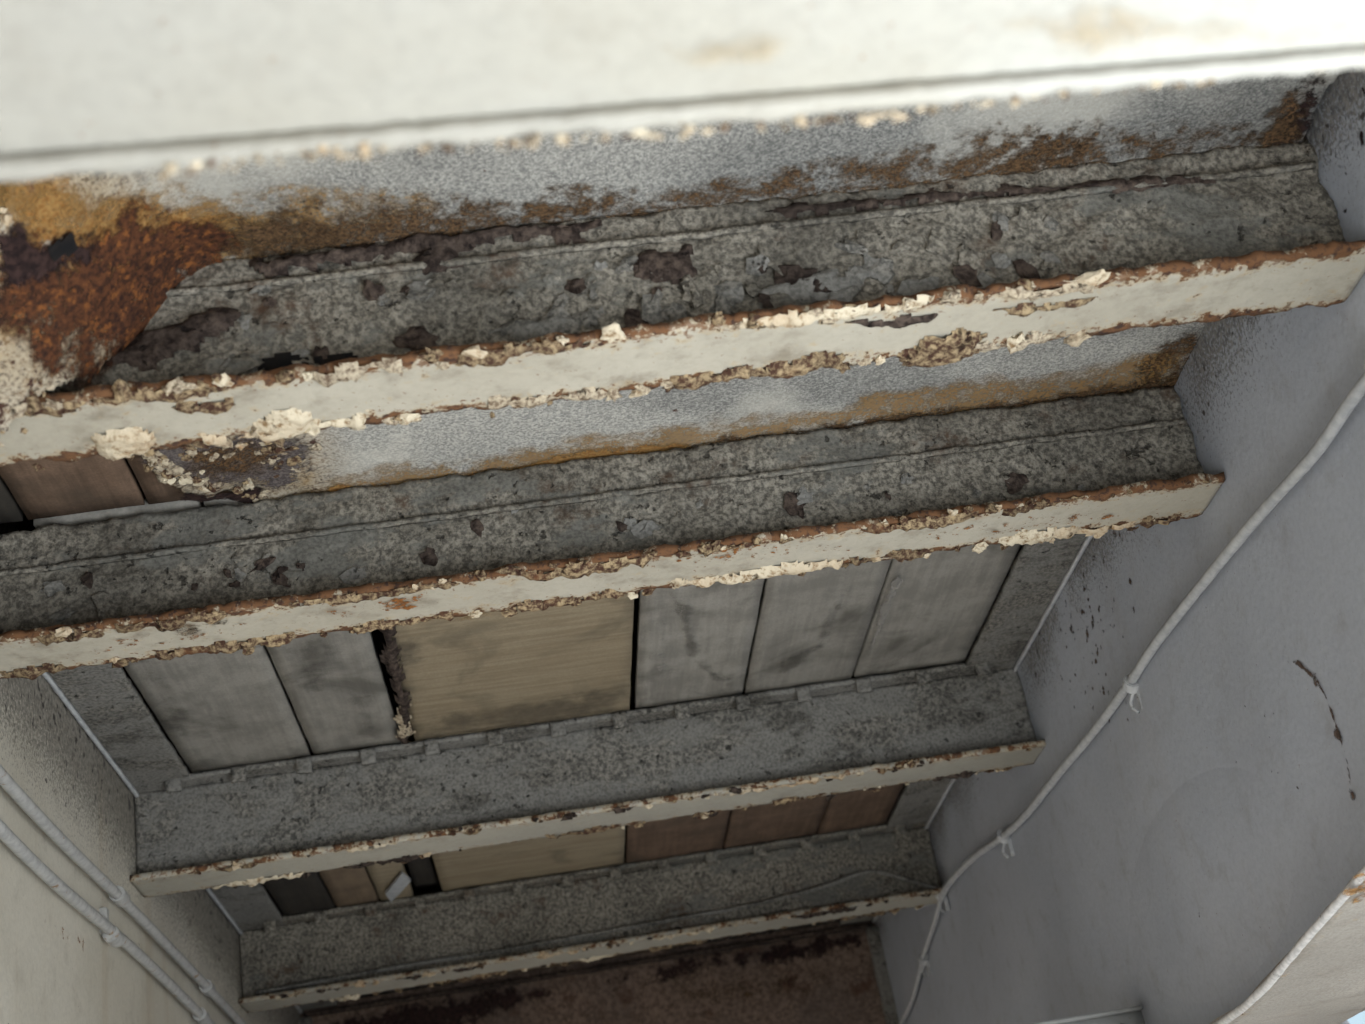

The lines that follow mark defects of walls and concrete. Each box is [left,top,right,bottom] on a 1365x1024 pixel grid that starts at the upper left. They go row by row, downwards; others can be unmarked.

rust [0,72,1339,434]
peeling [540,206,1111,374]
peeling [392,326,488,370]
peeling [0,344,77,434]
peeling [162,346,370,415]
peeling [382,413,421,425]
peeling [777,485,815,544]
peeling [932,469,1050,521]
peeling [224,552,305,605]
peeling [391,547,456,594]
peeling [955,542,1009,554]
peeling [688,787,742,819]